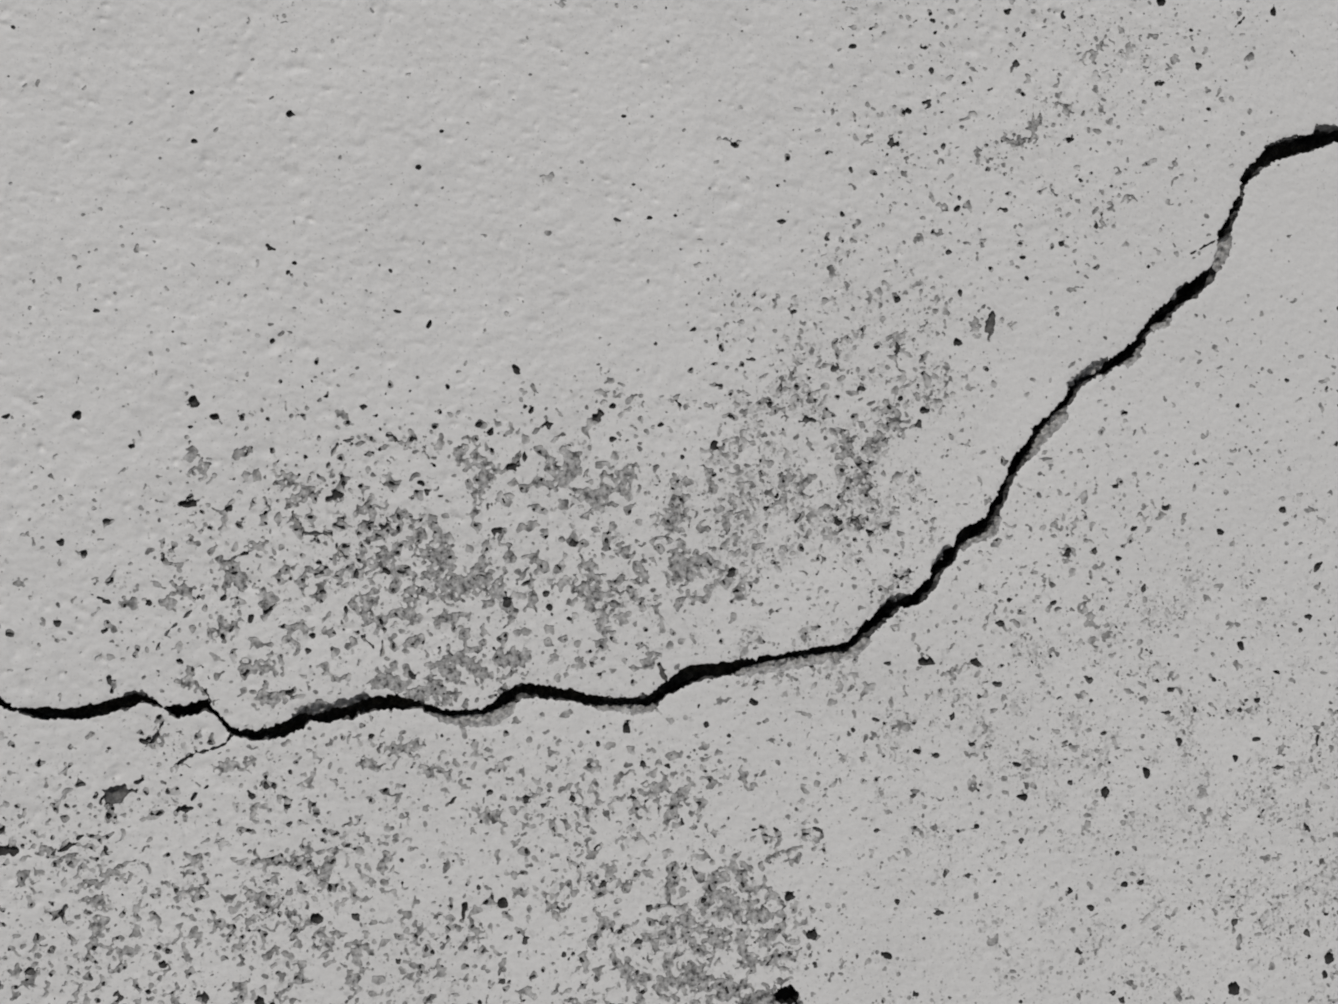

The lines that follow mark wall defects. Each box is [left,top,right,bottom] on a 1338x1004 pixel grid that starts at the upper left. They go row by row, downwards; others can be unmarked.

crack [0,124,1338,812]